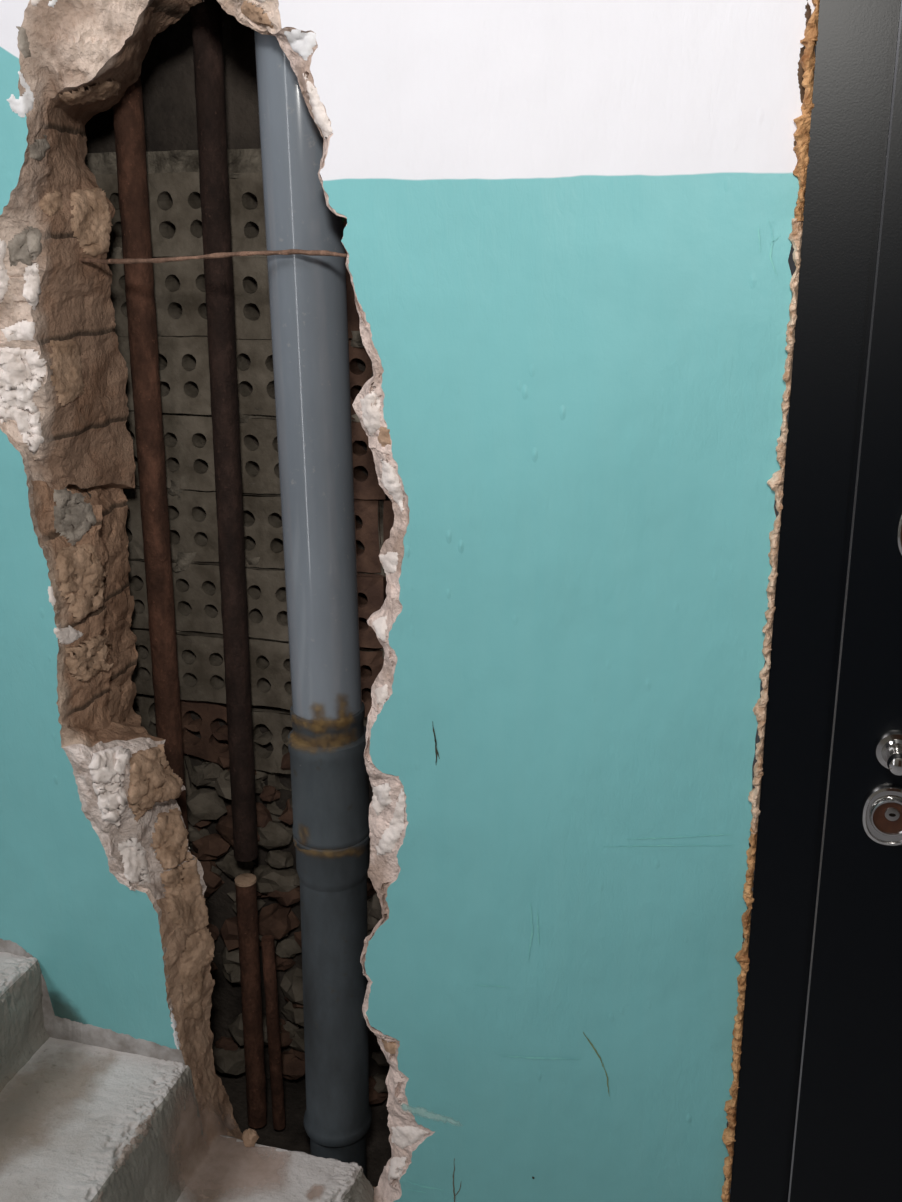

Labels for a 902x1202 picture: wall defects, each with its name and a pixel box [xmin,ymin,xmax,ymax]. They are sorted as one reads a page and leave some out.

flaking render [0,0,243,1140]
spalling [112,1108,156,1173]
flaking render [271,27,435,1202]